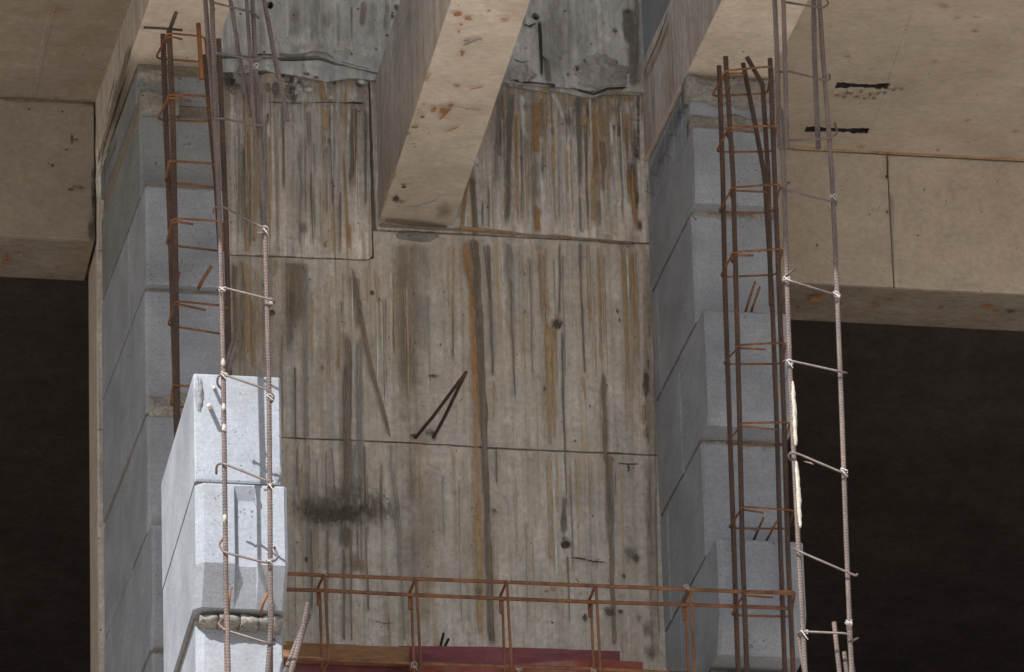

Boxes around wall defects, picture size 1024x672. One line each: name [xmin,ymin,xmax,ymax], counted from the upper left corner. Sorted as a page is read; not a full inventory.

leakage [224,71,367,242]
rust [407,104,458,134]
rust [527,87,569,220]
rust [627,170,638,227]
leakage [281,262,416,640]
rust [379,181,633,630]